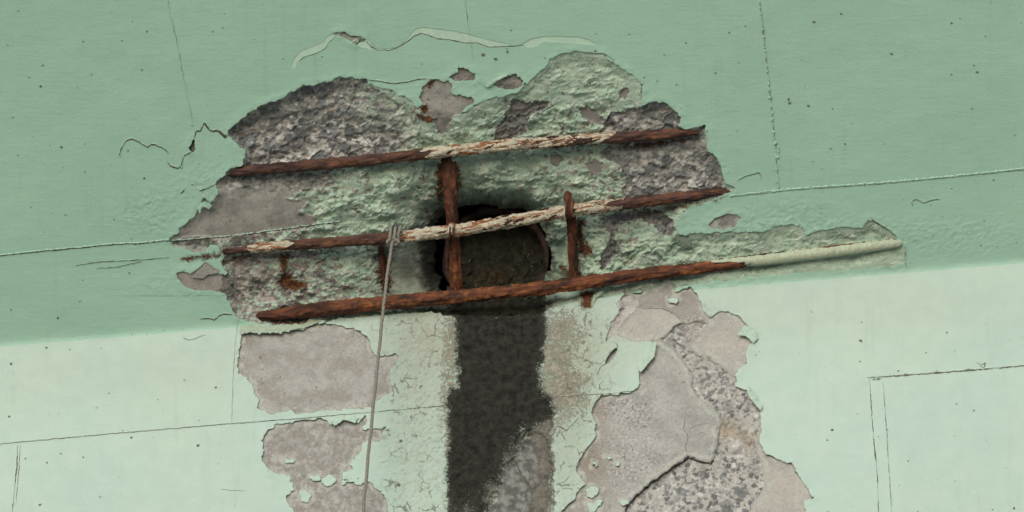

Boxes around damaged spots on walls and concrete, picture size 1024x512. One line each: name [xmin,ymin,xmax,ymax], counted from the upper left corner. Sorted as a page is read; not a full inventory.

crack [119,122,227,194]
rust [620,137,690,151]
rust [435,163,443,202]
rust [577,217,593,258]
rust [278,252,308,292]
rust [374,248,394,293]
spalling [169,27,905,512]
rust [579,290,594,310]
water stain [436,301,593,512]